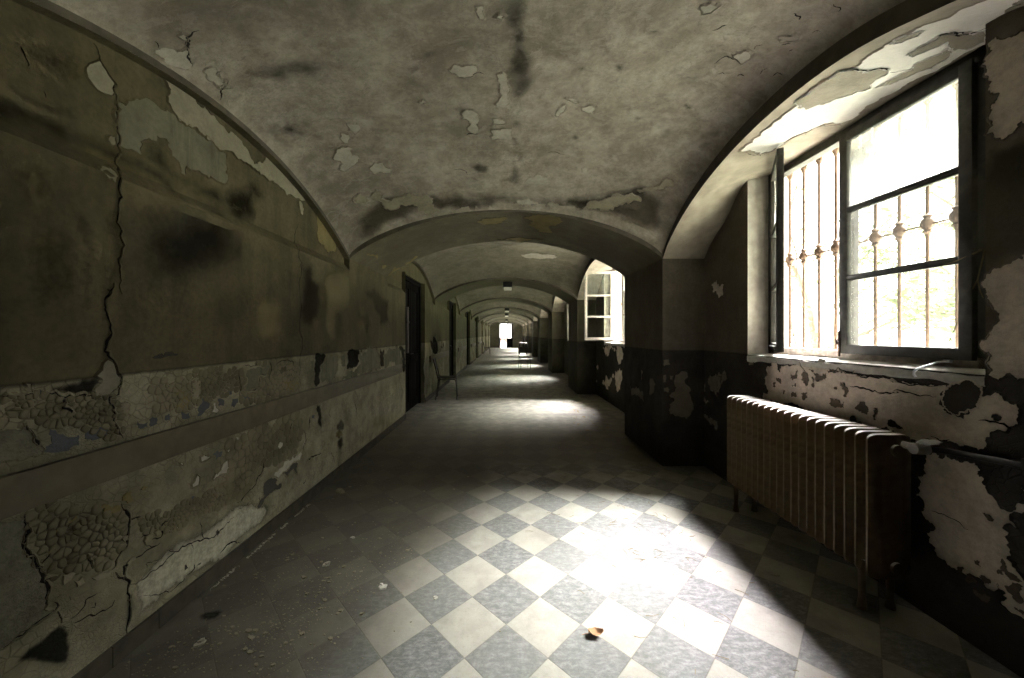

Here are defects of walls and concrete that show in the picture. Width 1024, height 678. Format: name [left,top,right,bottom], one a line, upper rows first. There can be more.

crack [0,43,127,445]
peeling [84,32,337,253]
peeling [370,189,440,217]
peeling [460,72,514,141]
peeling [737,0,1024,155]
peeling [0,517,55,651]
peeling [92,358,122,397]
crack [4,410,339,648]
peeling [256,433,306,509]
peeling [309,345,403,384]
peeling [596,342,728,431]
peeling [748,253,1024,621]